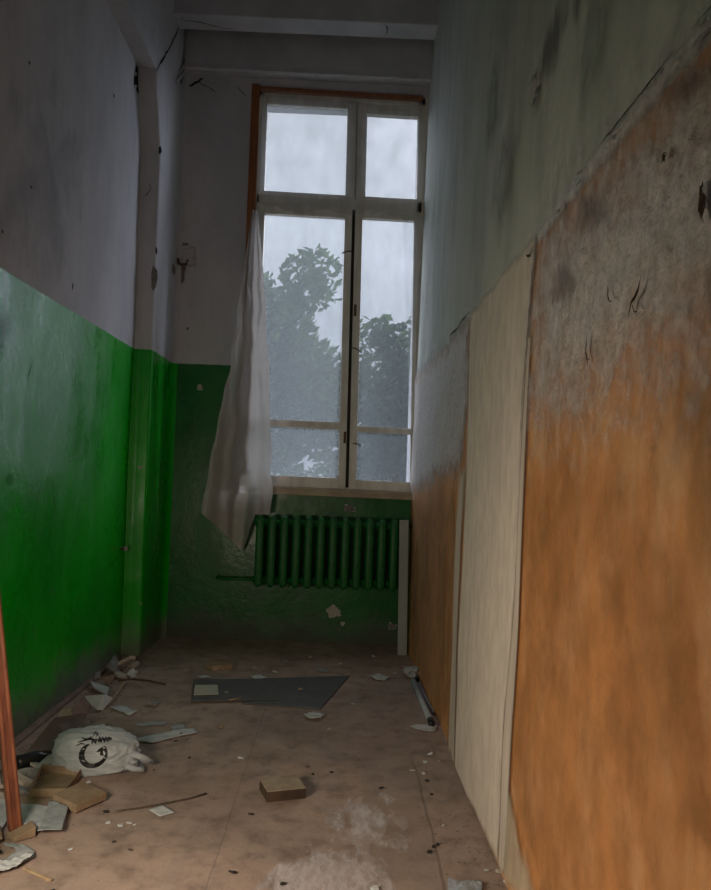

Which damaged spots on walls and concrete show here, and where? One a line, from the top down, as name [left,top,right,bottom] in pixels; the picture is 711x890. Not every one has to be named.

crack [598,52,673,147]
spalling [326,604,345,626]